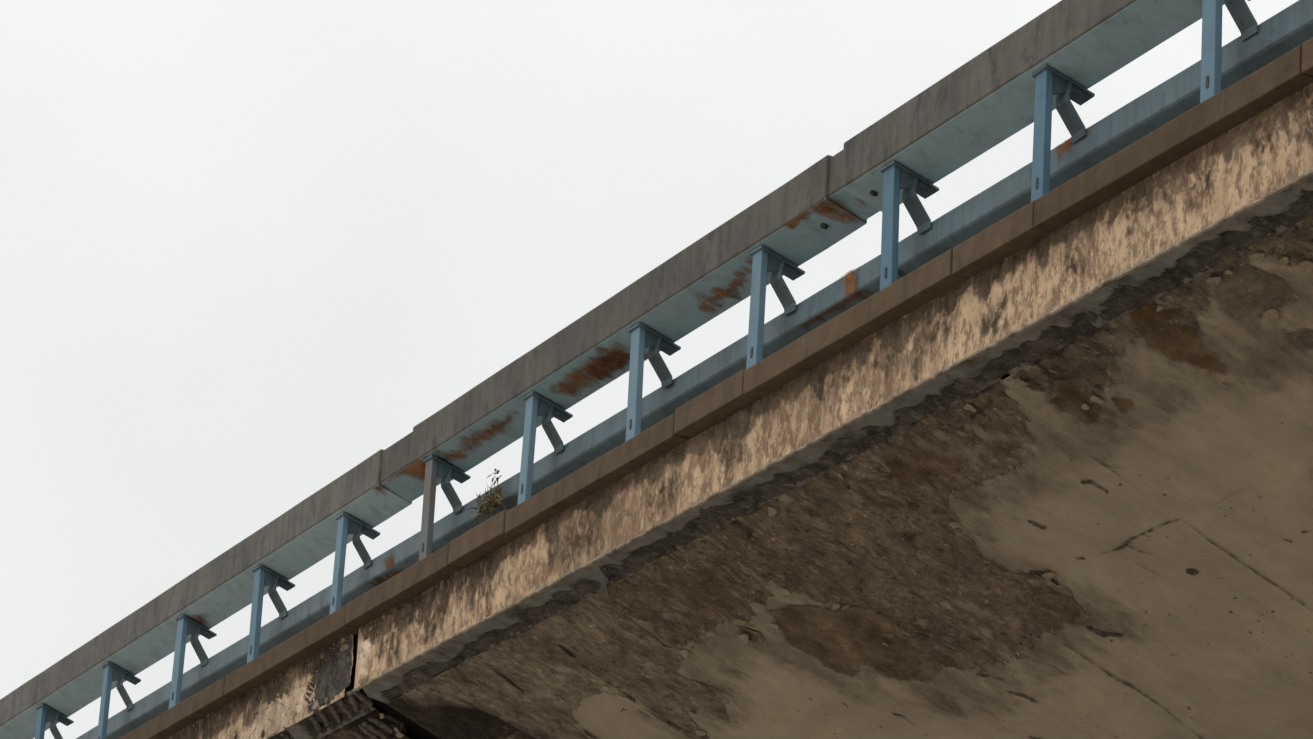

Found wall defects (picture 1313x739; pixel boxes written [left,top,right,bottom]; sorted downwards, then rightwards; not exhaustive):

rust [785,198,864,228]
rust [697,261,750,311]
rust [801,269,867,326]
rust [553,347,648,395]
rust [373,418,511,492]
peeling [228,189,1313,739]
crack [1104,520,1305,606]